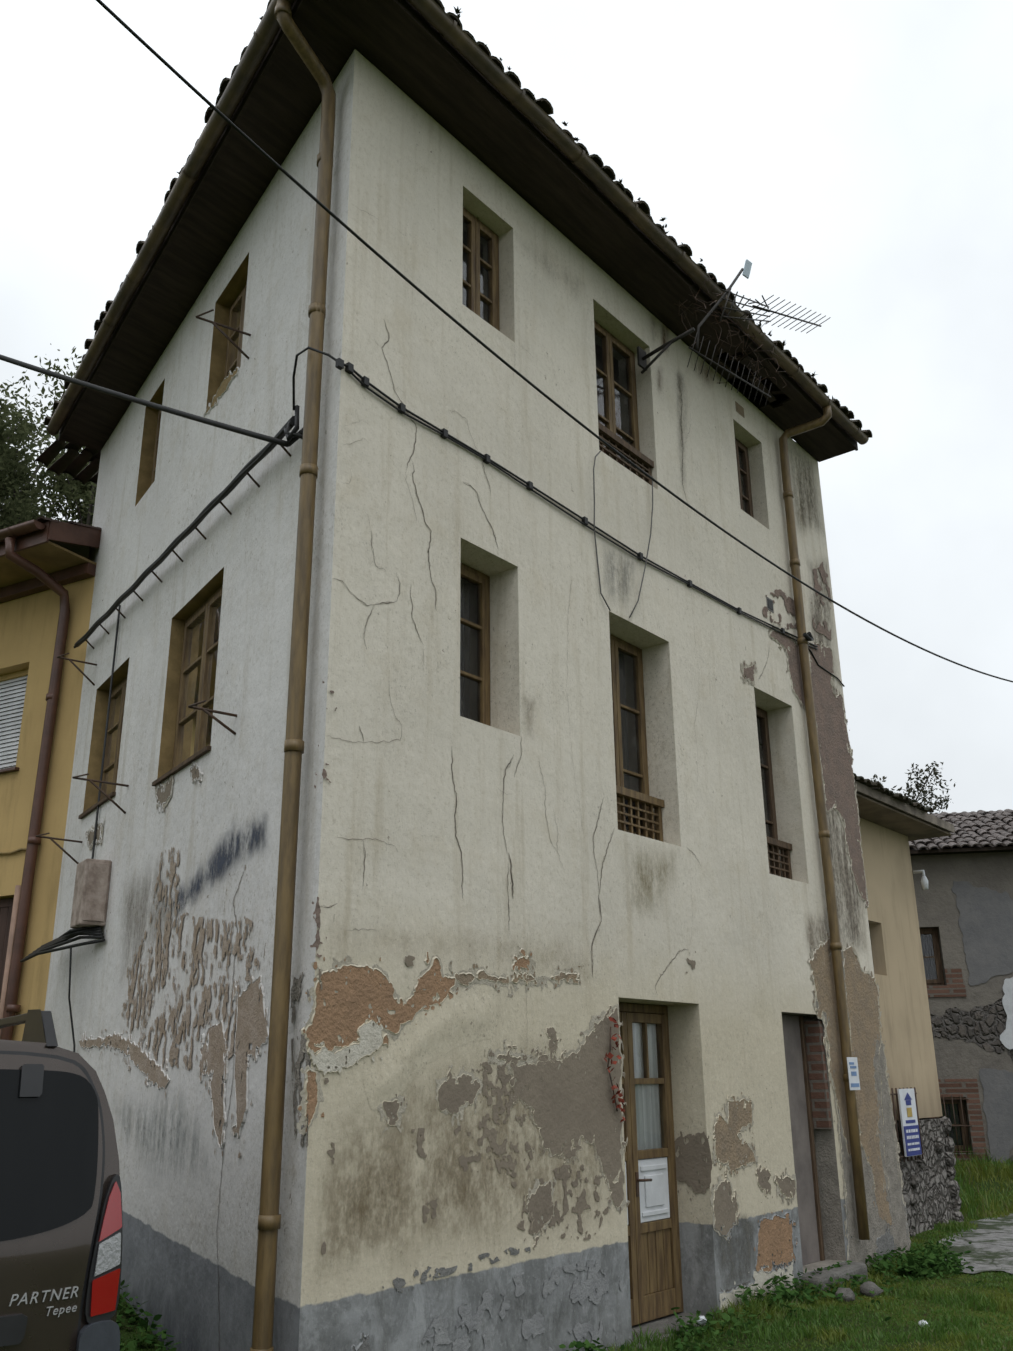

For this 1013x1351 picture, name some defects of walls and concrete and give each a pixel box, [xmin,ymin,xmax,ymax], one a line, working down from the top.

crack [337,323,436,664]
crack [328,685,402,743]
crack [337,837,394,884]
crack [450,736,463,890]
spalling [763,562,869,908]
peeling [79,847,269,1158]
spalling [291,897,581,1148]
peeling [377,1004,630,1294]
peeling [422,1259,622,1351]
spalling [675,1092,798,1312]
spalling [930,977,1013,1163]